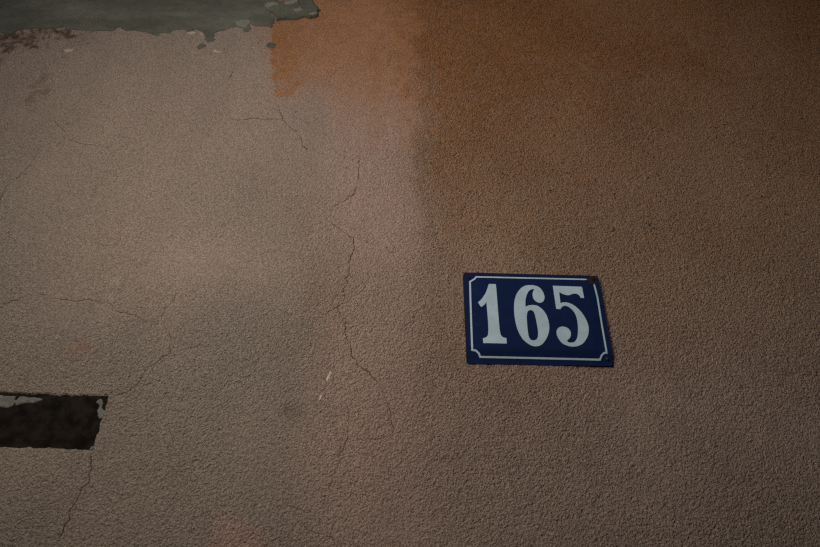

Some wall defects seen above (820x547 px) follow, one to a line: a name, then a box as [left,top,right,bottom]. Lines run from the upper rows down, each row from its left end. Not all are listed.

crack [326,150,393,488]